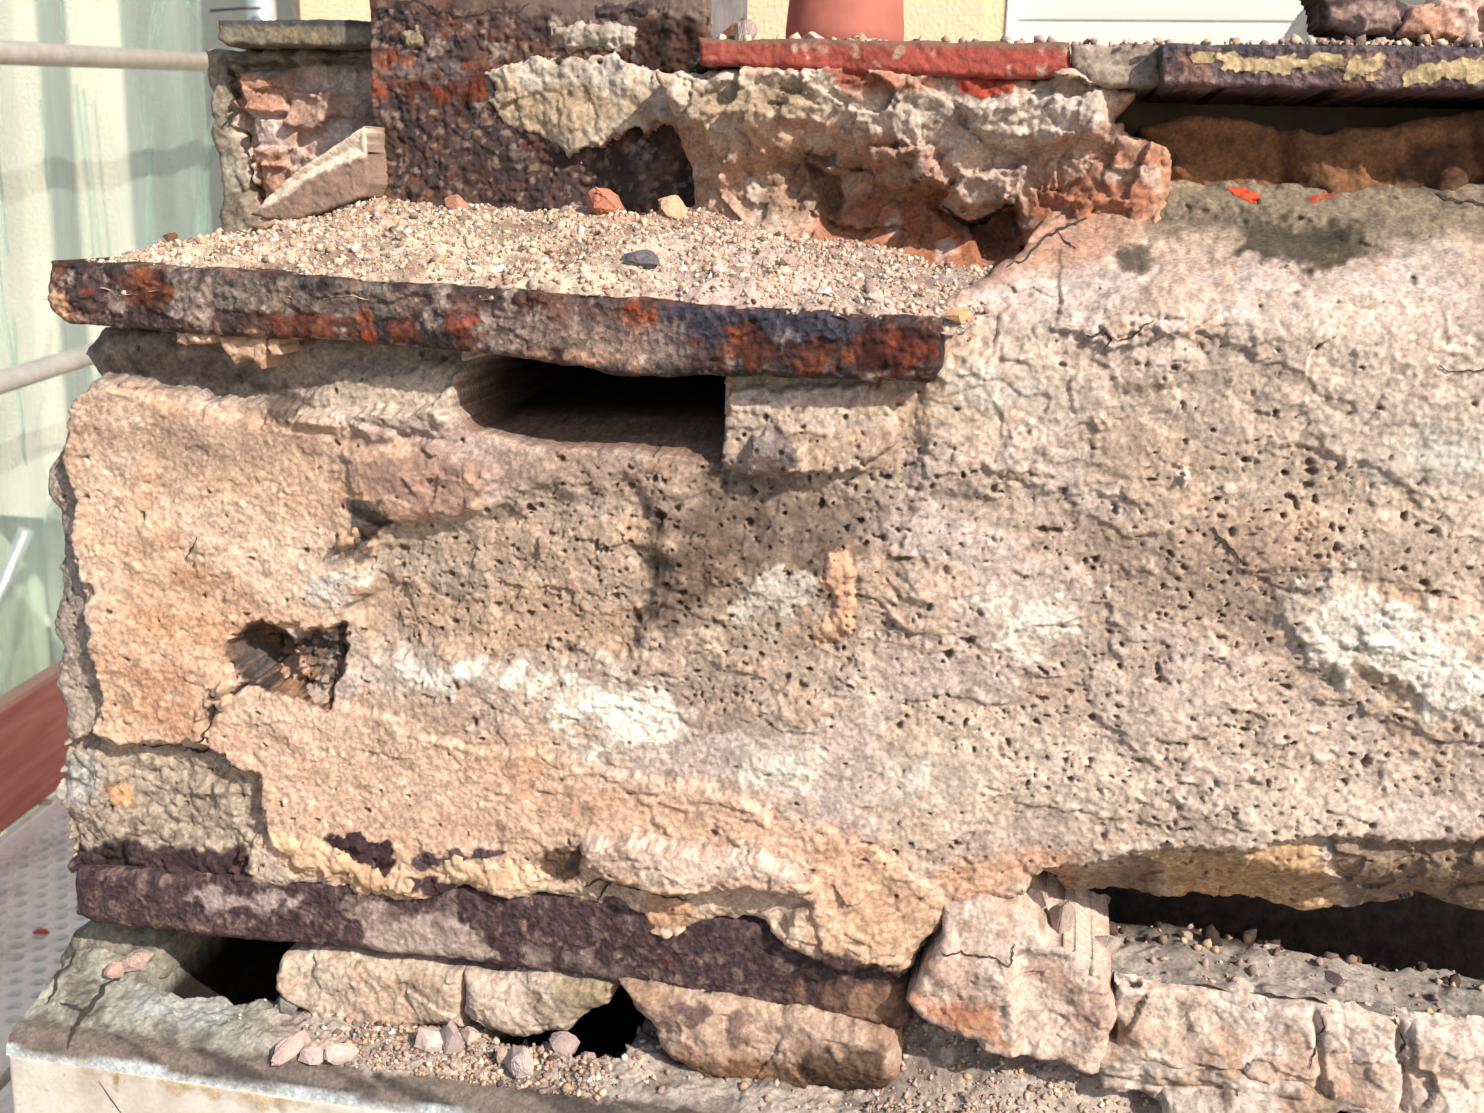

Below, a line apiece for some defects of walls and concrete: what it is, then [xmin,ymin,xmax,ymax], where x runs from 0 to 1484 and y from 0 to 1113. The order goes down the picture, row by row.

corrosion [616,13,699,74]
spalling [655,66,1172,274]
crack [1007,212,1093,267]
corrosion [725,318,939,380]
peeling [279,649,334,703]
corrosion [67,838,252,886]
corrosion [323,831,506,896]
spalling [1026,887,1075,934]
crack [47,949,127,1049]
spalling [104,948,154,979]
corrosion [816,952,903,979]
spalling [1326,970,1350,986]